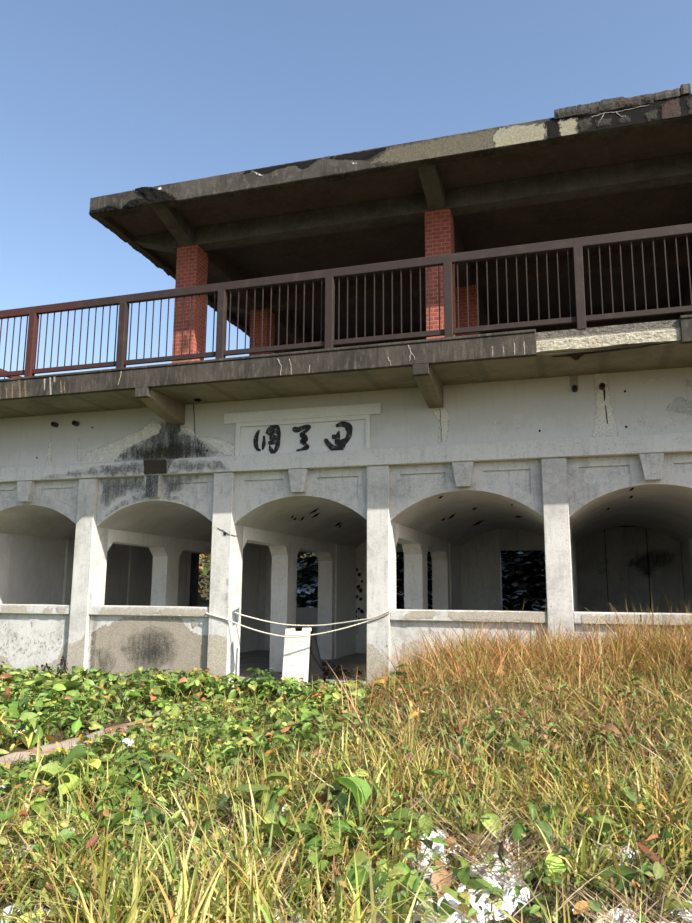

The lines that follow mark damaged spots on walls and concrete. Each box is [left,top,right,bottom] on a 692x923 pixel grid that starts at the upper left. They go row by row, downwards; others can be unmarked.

peeling [244,94,692,175]
crack [592,105,649,122]
damp [73,419,235,510]